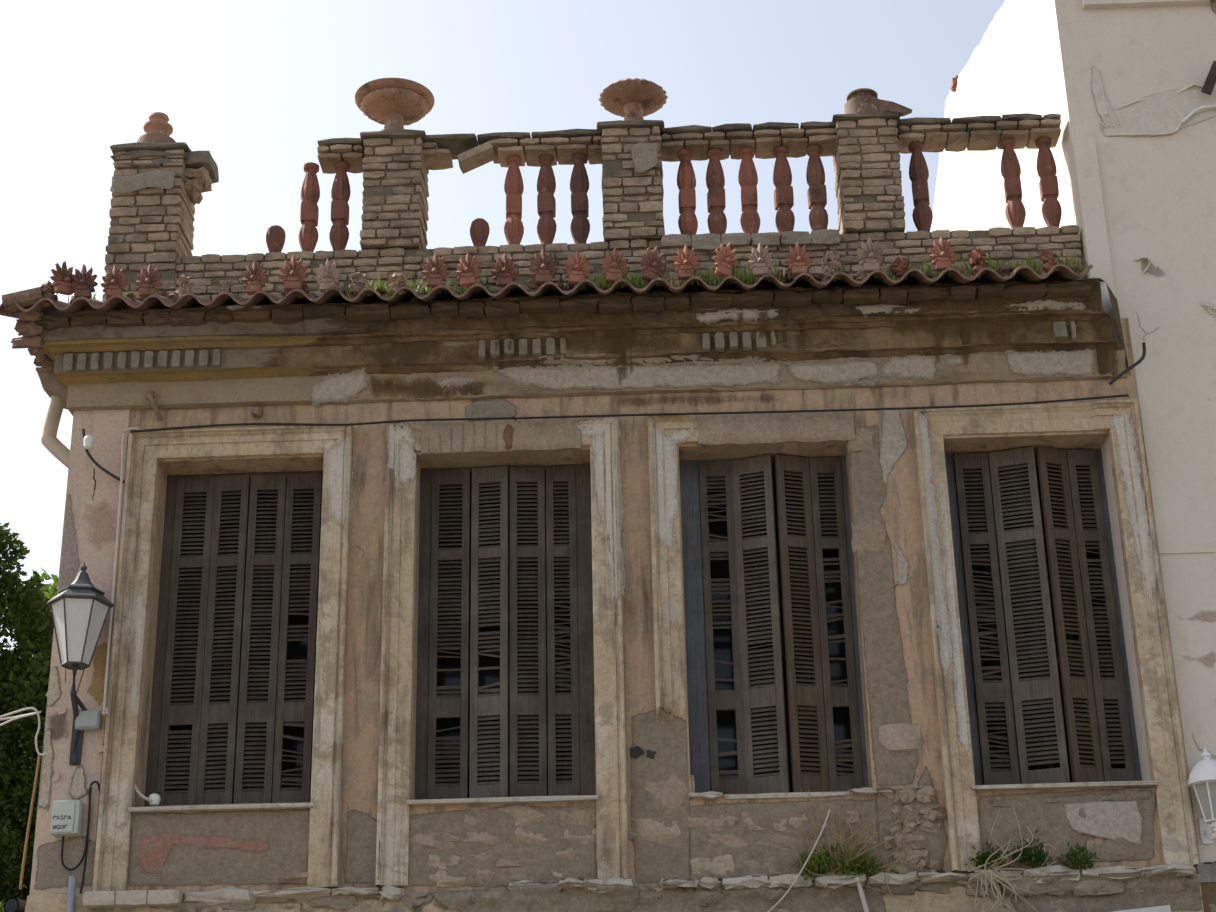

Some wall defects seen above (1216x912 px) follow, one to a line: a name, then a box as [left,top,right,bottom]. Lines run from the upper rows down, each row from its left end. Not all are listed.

peeling [310,367,368,408]
peeling [430,374,475,391]
peeling [491,351,966,390]
peeling [1190,612,1216,621]
flaking render [647,407,969,874]
peeling [1200,653,1216,666]
peeling [128,808,310,887]
flaking render [429,707,695,912]
peeling [978,785,1157,870]